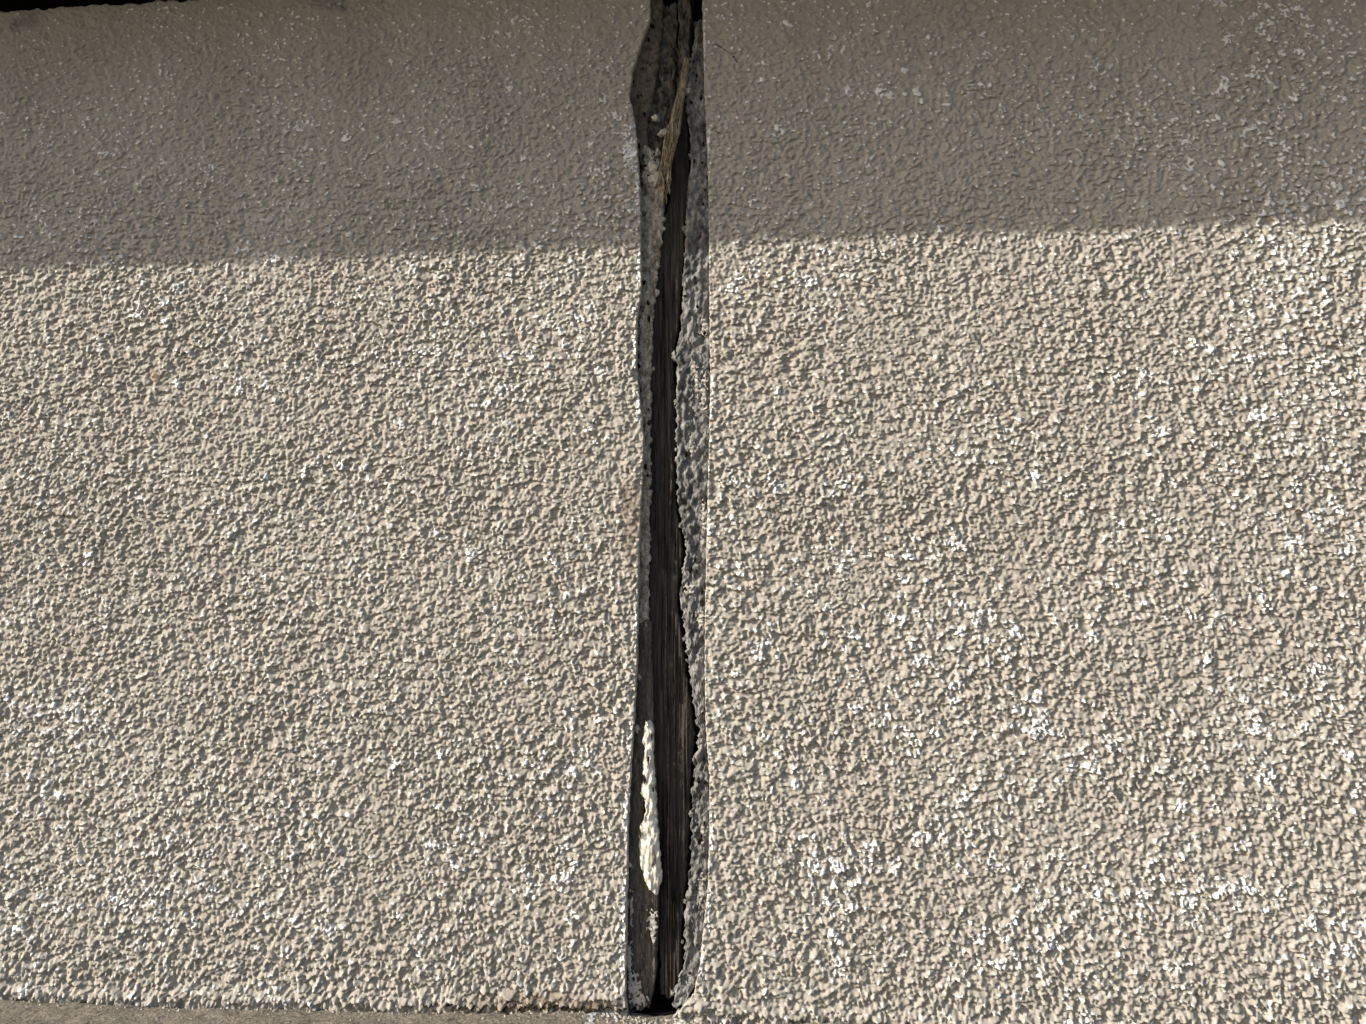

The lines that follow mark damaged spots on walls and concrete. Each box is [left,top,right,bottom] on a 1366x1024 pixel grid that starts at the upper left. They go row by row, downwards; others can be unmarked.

crack [662,782,670,936]